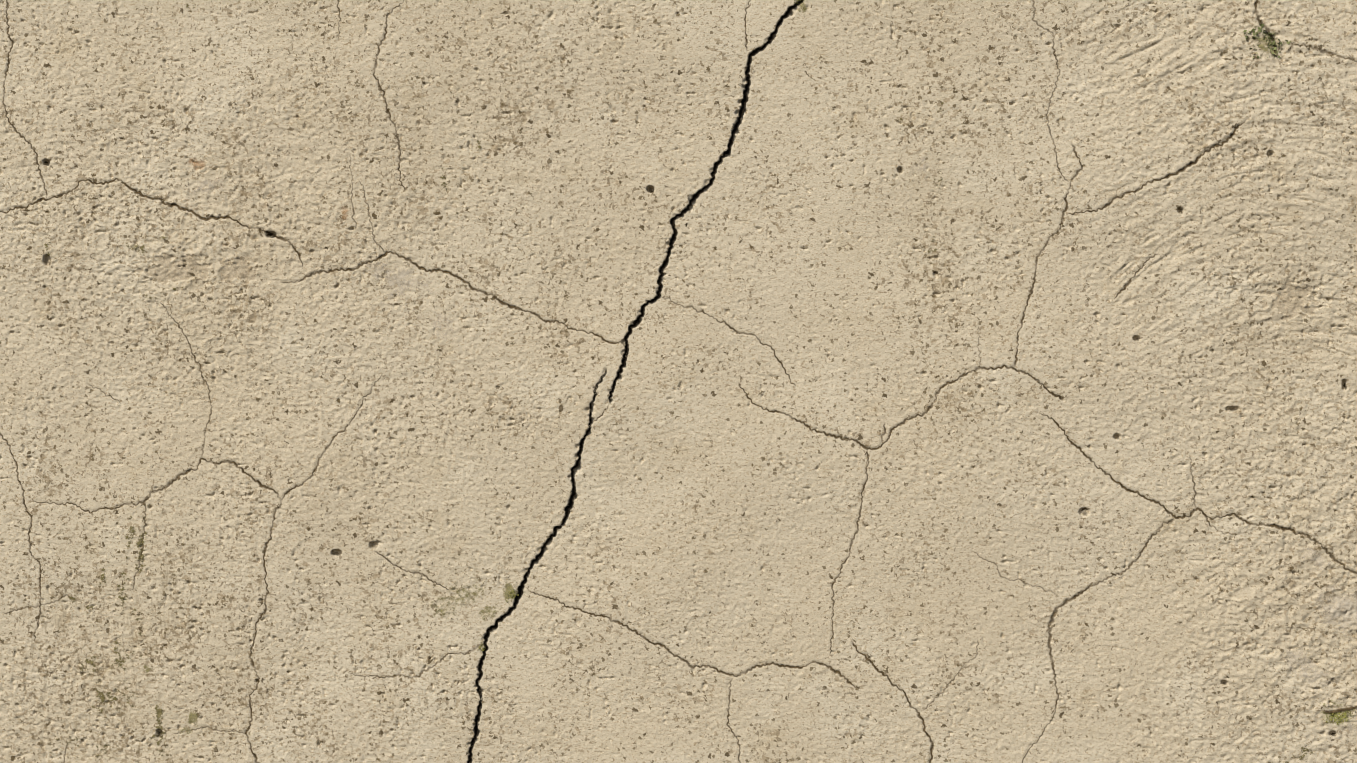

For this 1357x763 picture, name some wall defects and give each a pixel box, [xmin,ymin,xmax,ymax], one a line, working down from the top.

crack [1254,0,1357,62]
crack [0,0,858,763]
crack [739,123,1243,653]
crack [853,643,933,763]
crack [1022,414,1357,763]